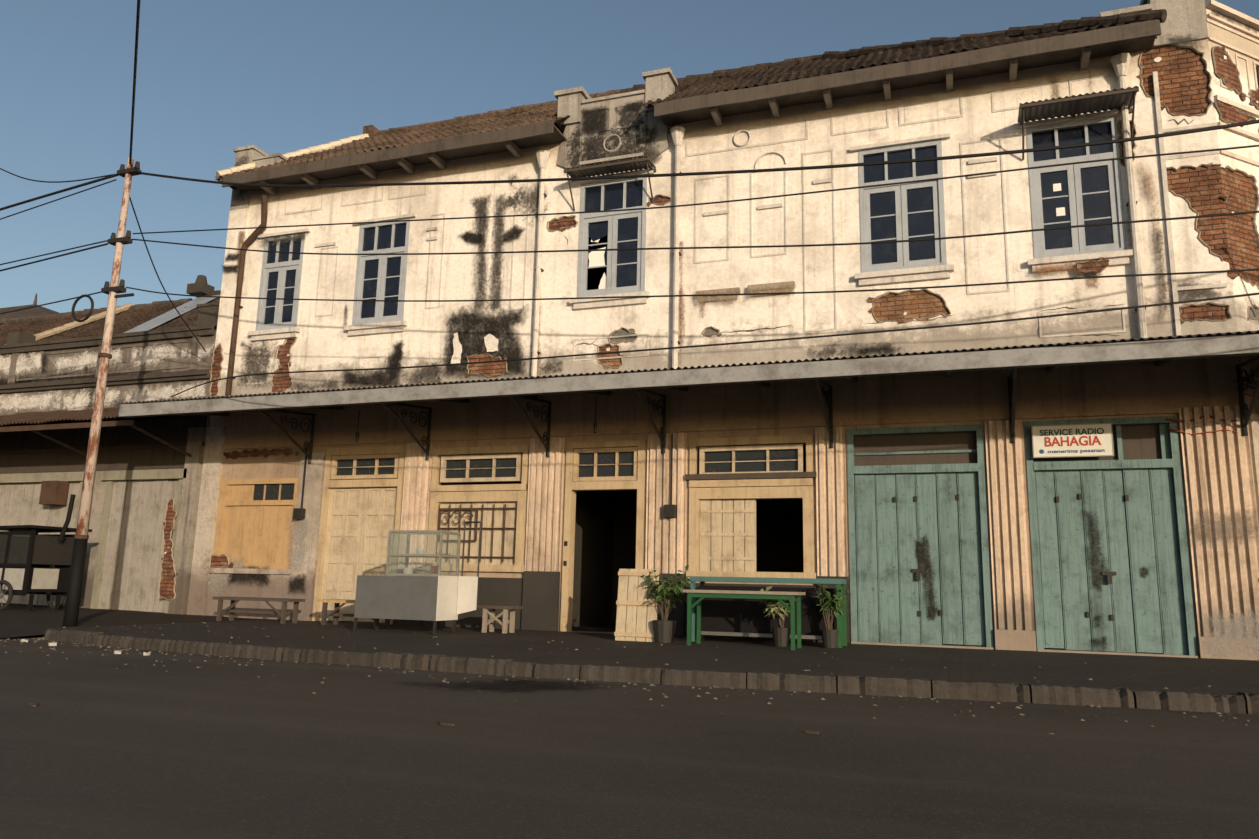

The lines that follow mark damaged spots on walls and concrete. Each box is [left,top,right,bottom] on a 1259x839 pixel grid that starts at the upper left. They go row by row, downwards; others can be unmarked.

spalling [1137,44,1259,127]
mould [564,101,662,168]
spalling [546,215,578,232]
spalling [1166,162,1259,290]
leakage [291,176,562,390]
spalling [866,289,951,324]
spalling [1076,257,1109,287]
spalling [1173,302,1259,324]
peeling [0,343,224,411]
spalling [270,337,297,393]
spalling [595,327,638,370]
spalling [158,498,178,600]